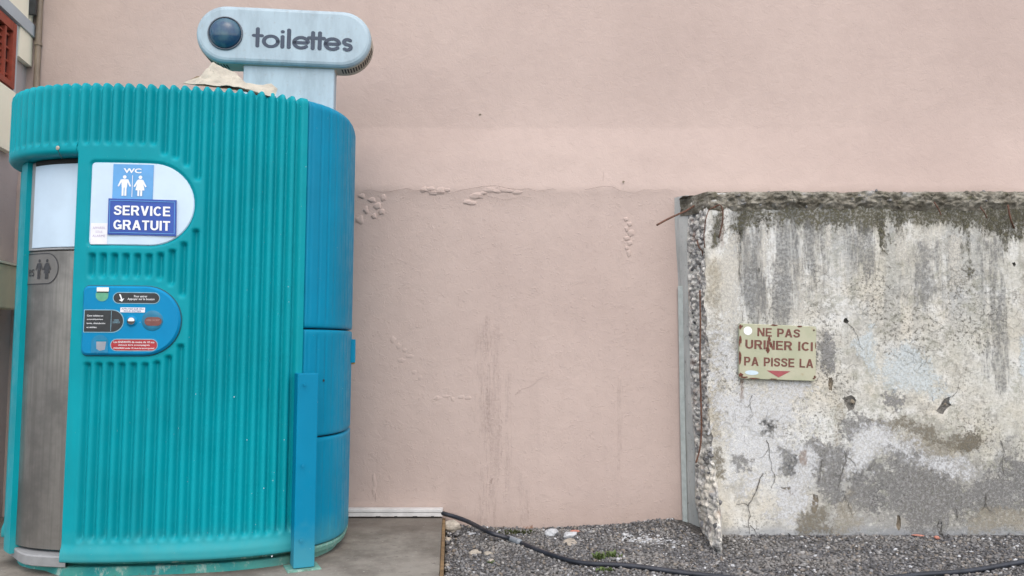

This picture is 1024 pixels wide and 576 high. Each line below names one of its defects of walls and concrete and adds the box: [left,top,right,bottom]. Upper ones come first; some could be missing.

leakage [711,206,1024,390]
leakage [712,447,755,479]
crack [727,396,796,534]
leakage [777,389,1024,535]